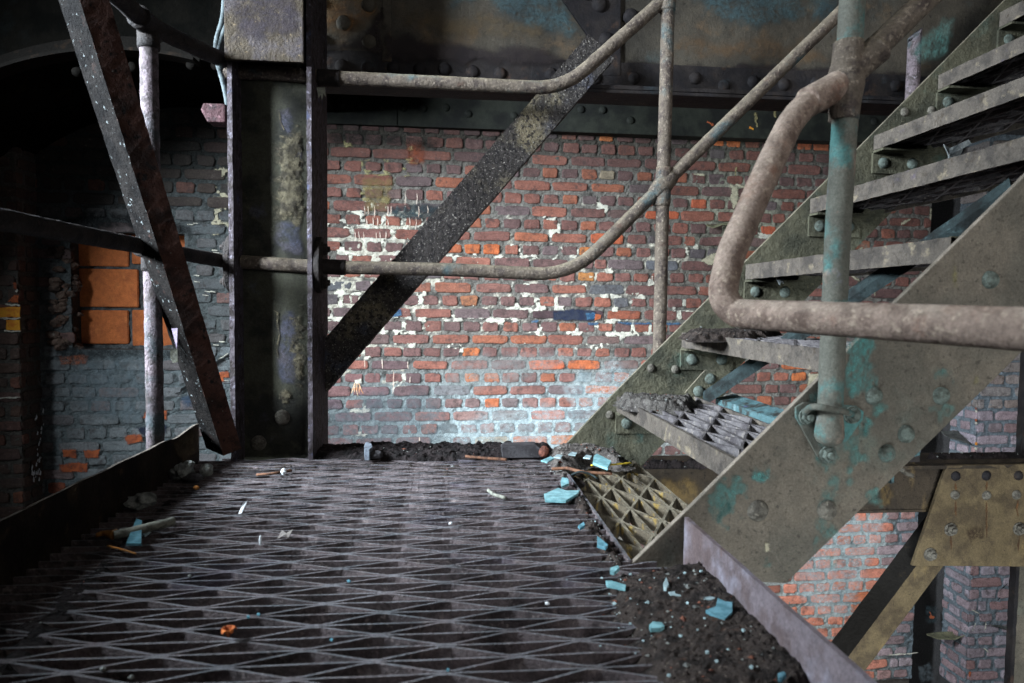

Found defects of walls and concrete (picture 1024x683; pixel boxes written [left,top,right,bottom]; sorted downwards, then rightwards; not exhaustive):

efflorescence [328,278,363,322]
efflorescence [379,291,426,348]
leakage [442,282,564,344]
leakage [566,276,654,350]
efflorescence [330,379,440,444]